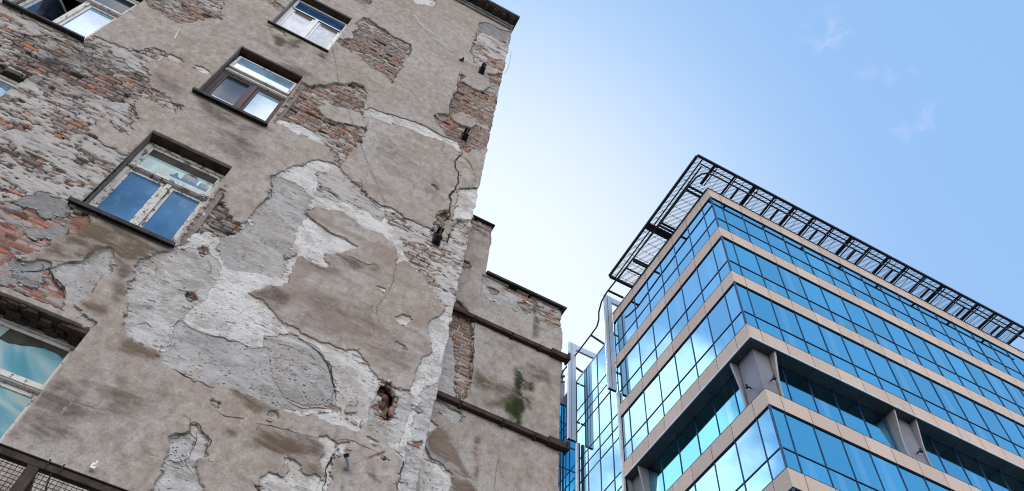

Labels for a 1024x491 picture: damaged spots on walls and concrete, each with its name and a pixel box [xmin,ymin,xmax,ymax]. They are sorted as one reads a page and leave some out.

peeling [0,4,181,331]
peeling [123,17,511,491]
crack [350,22,481,243]
damp [476,371,548,415]
peeling [481,276,561,328]